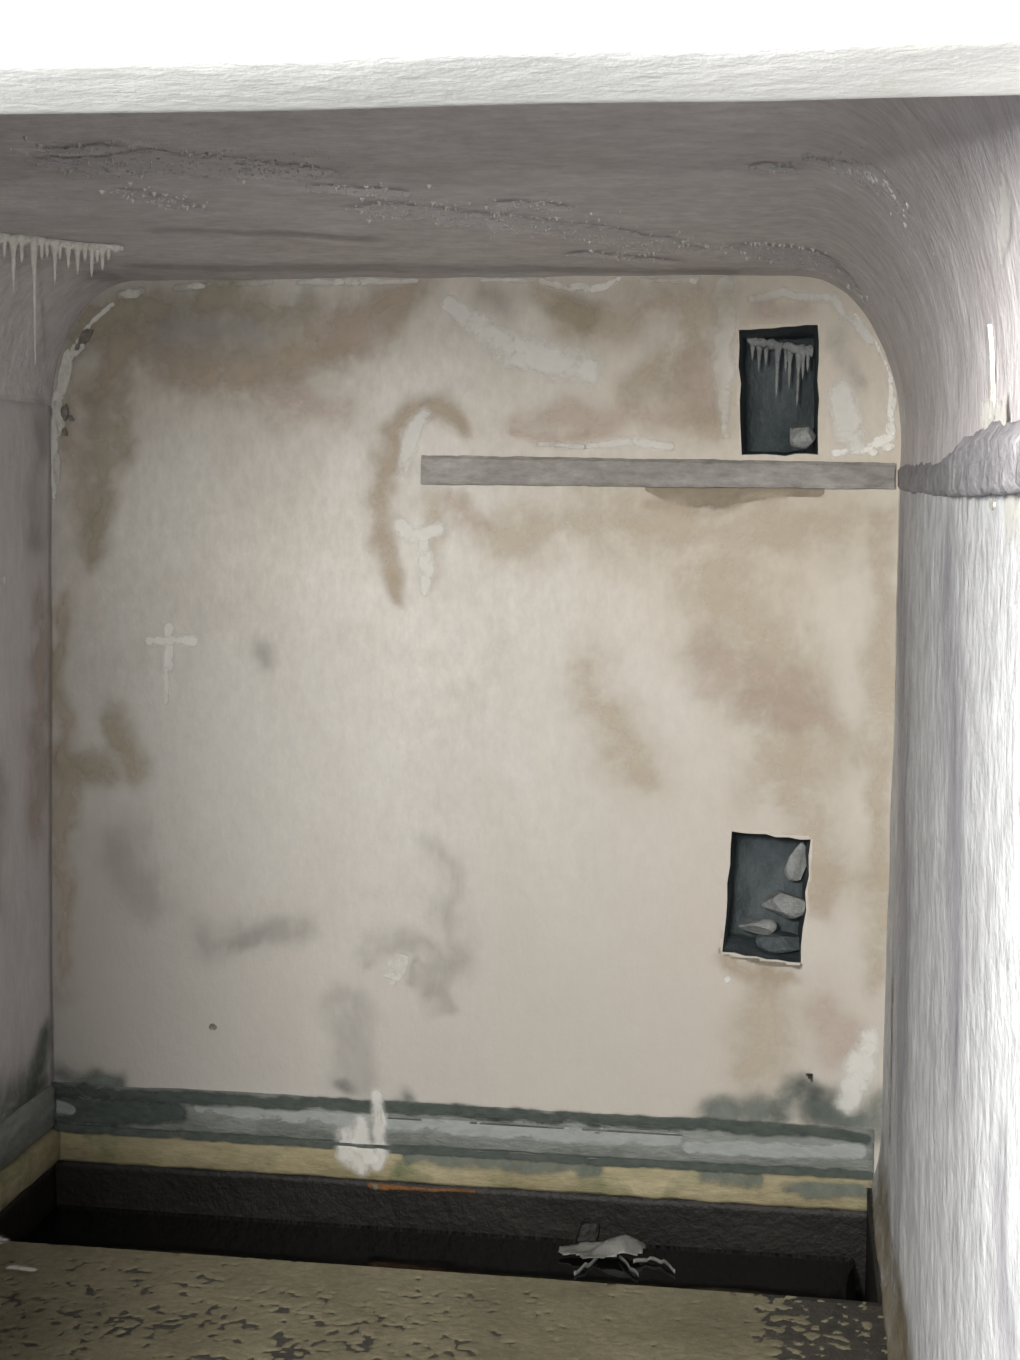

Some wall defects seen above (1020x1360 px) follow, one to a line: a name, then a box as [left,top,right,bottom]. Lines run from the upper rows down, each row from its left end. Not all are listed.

leakage [72,283,412,404]
leakage [442,296,598,383]
leakage [480,276,630,332]
leakage [640,276,736,439]
leakage [748,288,897,457]
leakage [375,400,467,506]
leakage [645,487,824,512]
leakage [377,519,443,599]
leakage [897,537,906,707]
leakage [889,724,908,1136]
leakage [338,1090,387,1174]